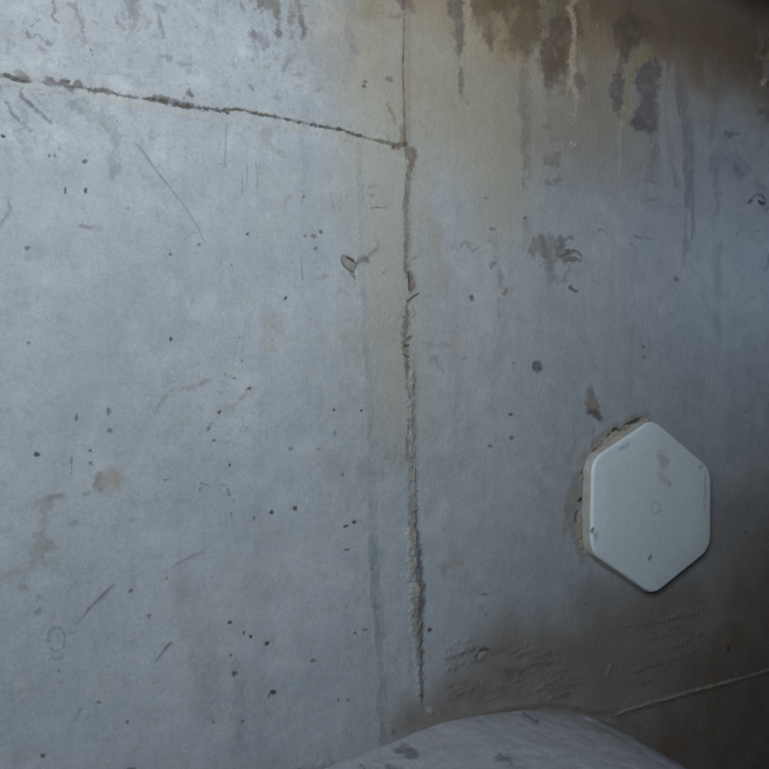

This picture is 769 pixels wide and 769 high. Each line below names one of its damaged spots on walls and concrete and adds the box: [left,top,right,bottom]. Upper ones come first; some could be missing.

water stain [114,0,192,69]
water stain [217,0,311,89]
water stain [444,0,753,271]
water stain [517,213,585,294]
crack [0,0,434,716]